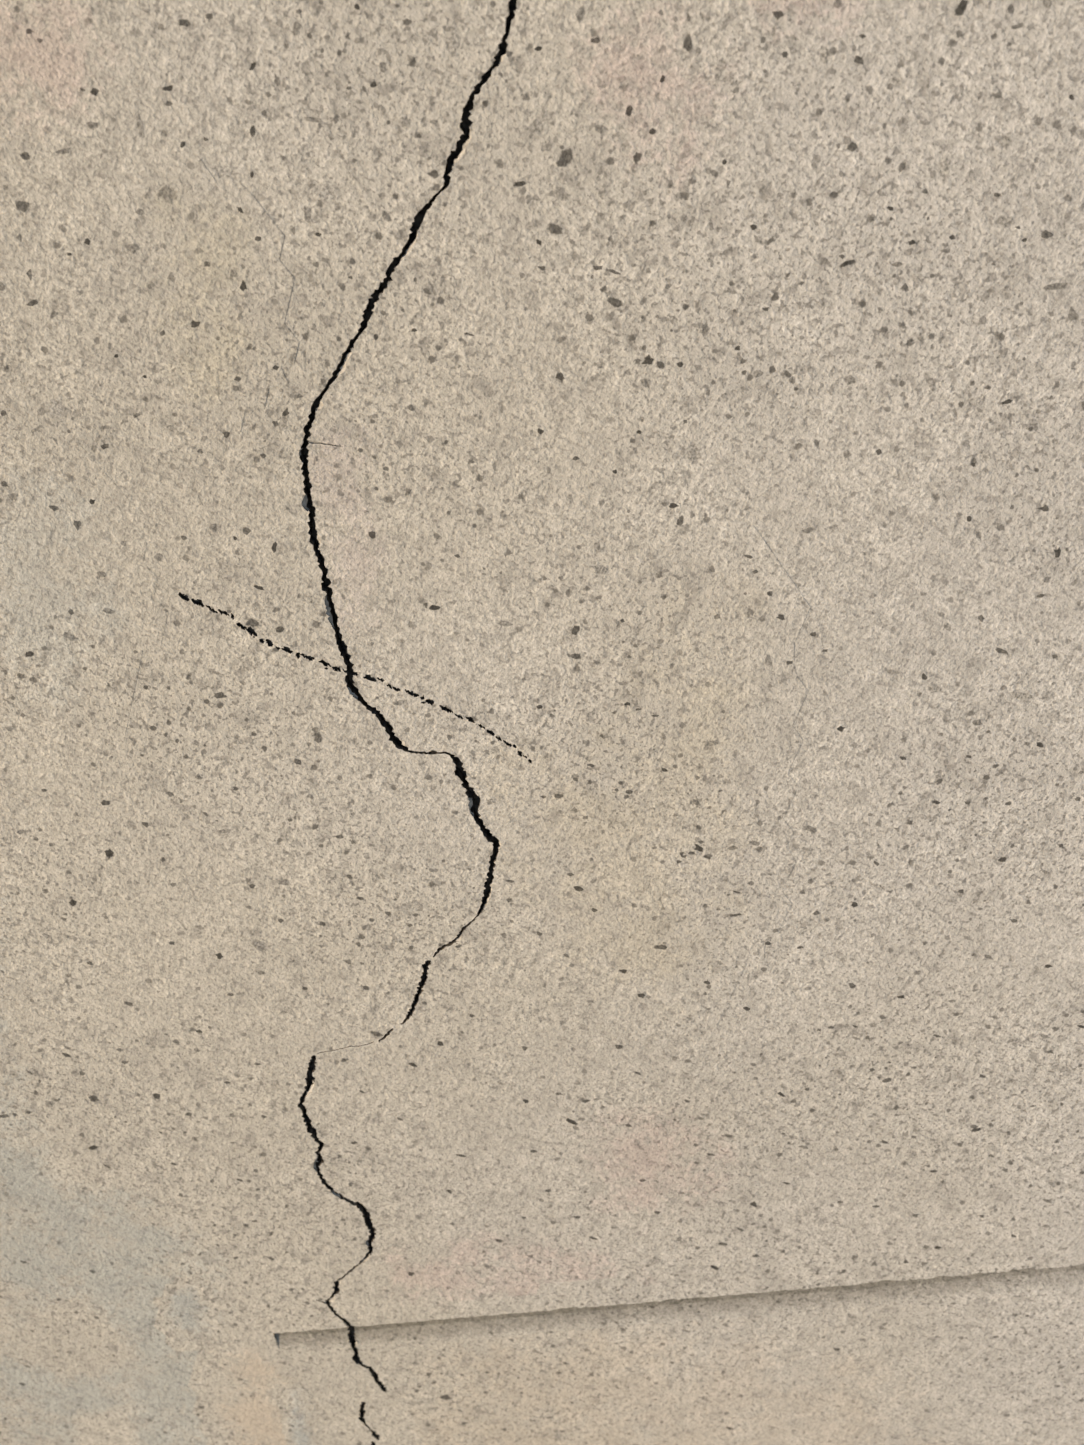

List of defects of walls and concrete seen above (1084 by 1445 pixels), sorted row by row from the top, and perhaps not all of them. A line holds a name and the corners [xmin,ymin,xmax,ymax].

crack [178,0,532,1445]